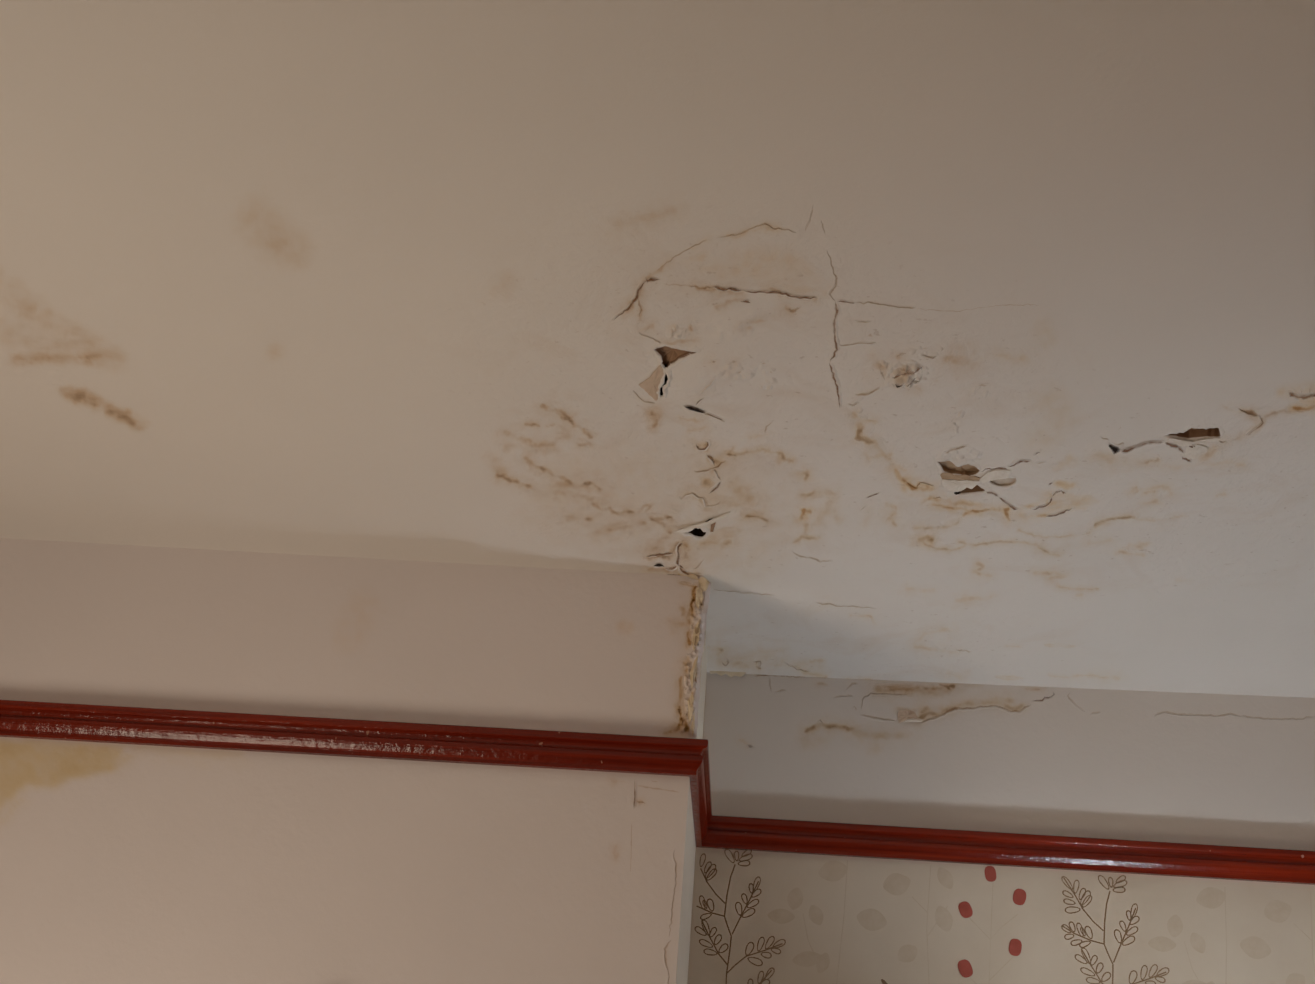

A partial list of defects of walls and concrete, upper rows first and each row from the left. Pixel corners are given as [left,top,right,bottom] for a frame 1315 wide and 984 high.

crack [612,205,916,407]
spalling [632,332,702,405]
spalling [1161,423,1225,459]
spalling [935,456,1019,497]
spalling [675,511,731,541]